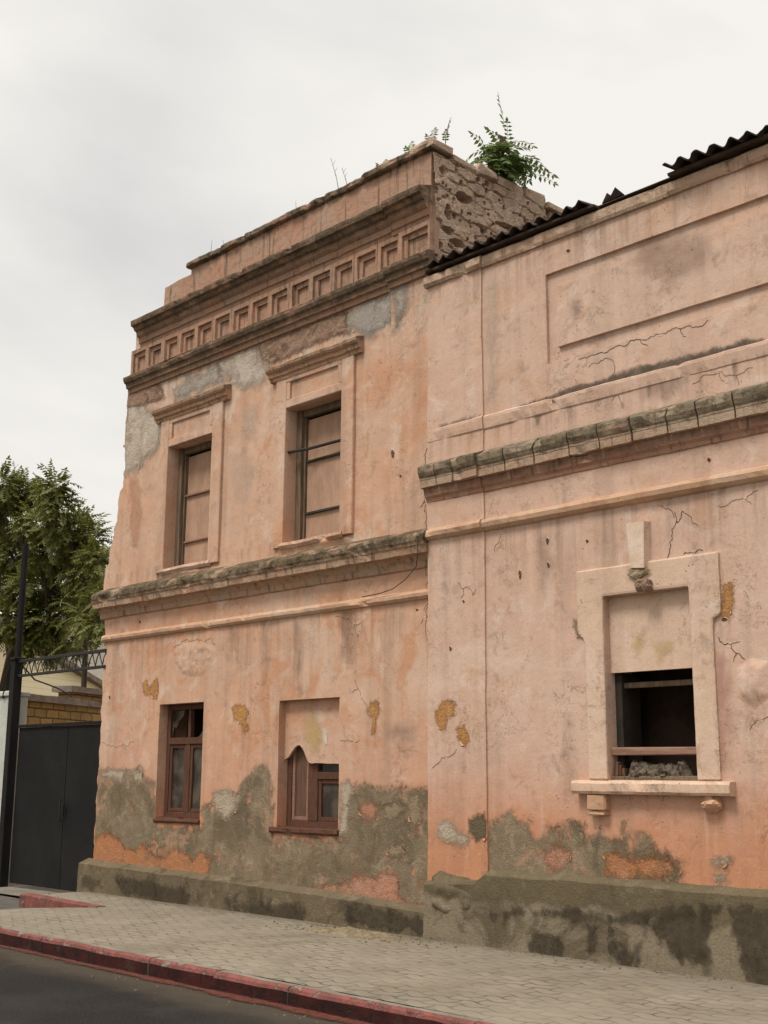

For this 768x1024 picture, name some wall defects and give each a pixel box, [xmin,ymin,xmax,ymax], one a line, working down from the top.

spalling [123,285,407,475]
crack [578,320,708,406]
crack [693,367,753,385]
crack [662,506,703,558]
crack [718,637,745,662]
peeling [95,764,428,905]
peeling [469,812,682,883]
leakage [489,904,768,985]